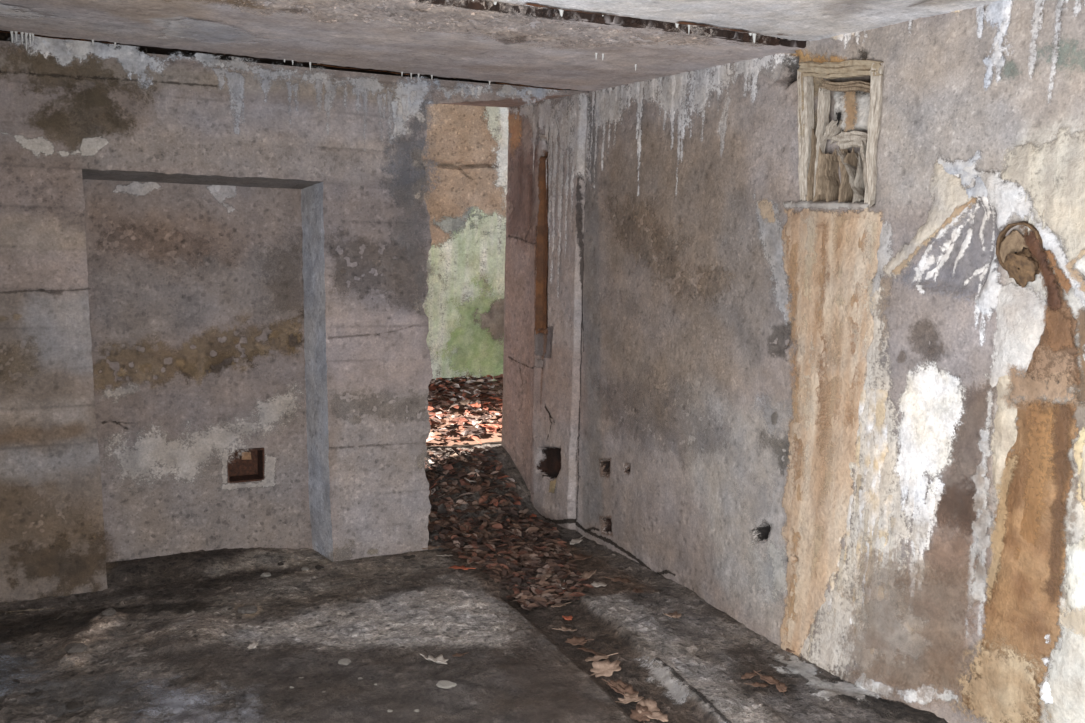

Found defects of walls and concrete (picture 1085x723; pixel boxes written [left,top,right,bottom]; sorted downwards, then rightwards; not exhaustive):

leakage [830,30,867,49]
leakage [975,0,1013,89]
leakage [1028,0,1085,103]
leakage [833,90,870,132]
leakage [0,18,796,384]
corrosion [534,150,548,404]
spalling [897,196,999,300]
leakage [753,127,1085,723]